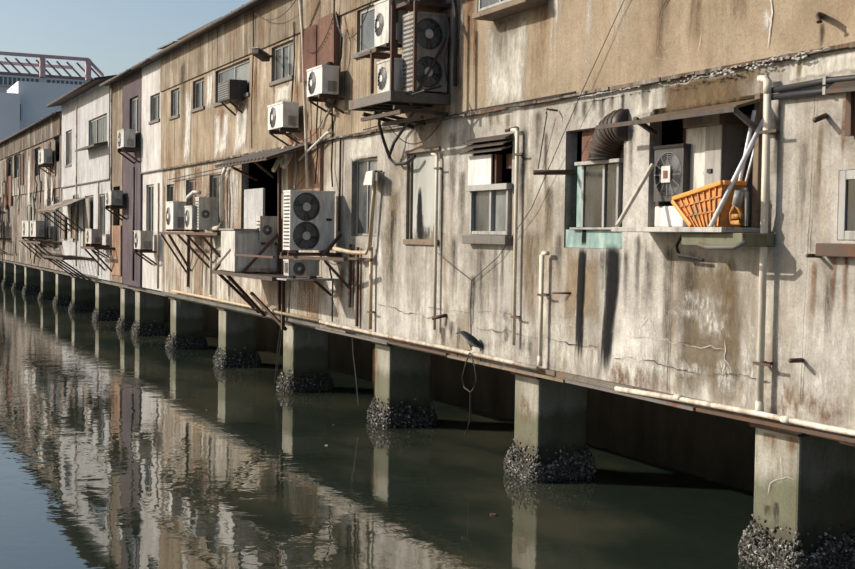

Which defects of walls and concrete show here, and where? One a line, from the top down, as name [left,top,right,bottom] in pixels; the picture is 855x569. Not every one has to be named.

spalling [659,47,832,88]
crack [764,0,773,48]
corrosion [810,107,821,208]
crack [379,277,767,389]
damp [551,230,649,367]
damp [664,263,757,405]